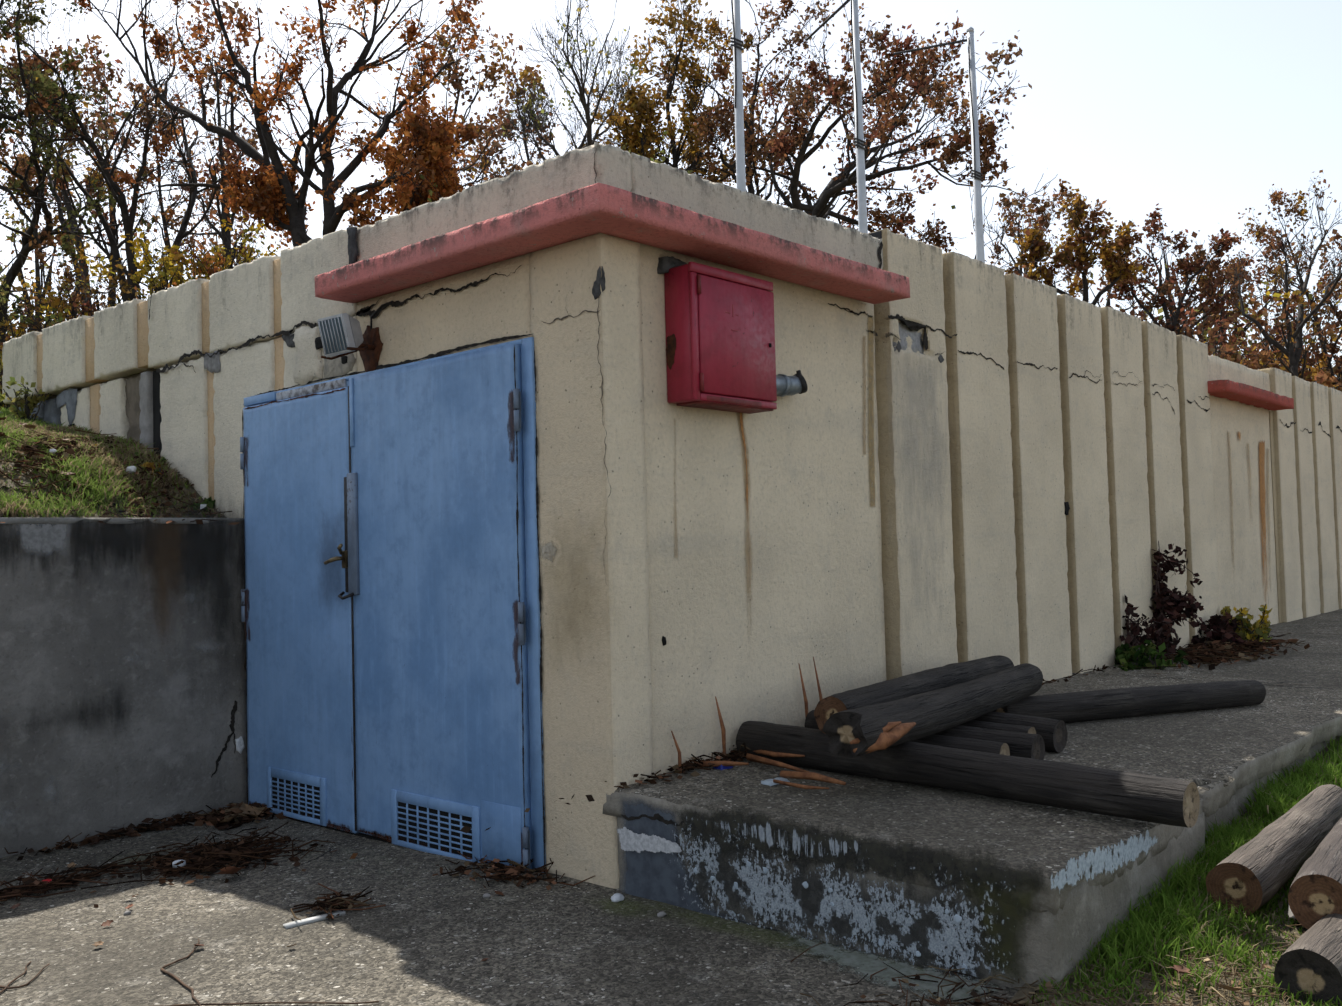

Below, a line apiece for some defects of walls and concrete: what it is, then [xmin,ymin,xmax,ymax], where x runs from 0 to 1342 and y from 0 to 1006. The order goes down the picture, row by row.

crack [356,265,521,319]
crack [156,321,317,373]
spalling [892,319,944,363]
crack [828,303,1210,414]
rust [740,413,748,509]
rust [1259,441,1268,602]
damp [0,509,244,631]
crack [211,700,237,778]
peeling [617,800,1018,981]